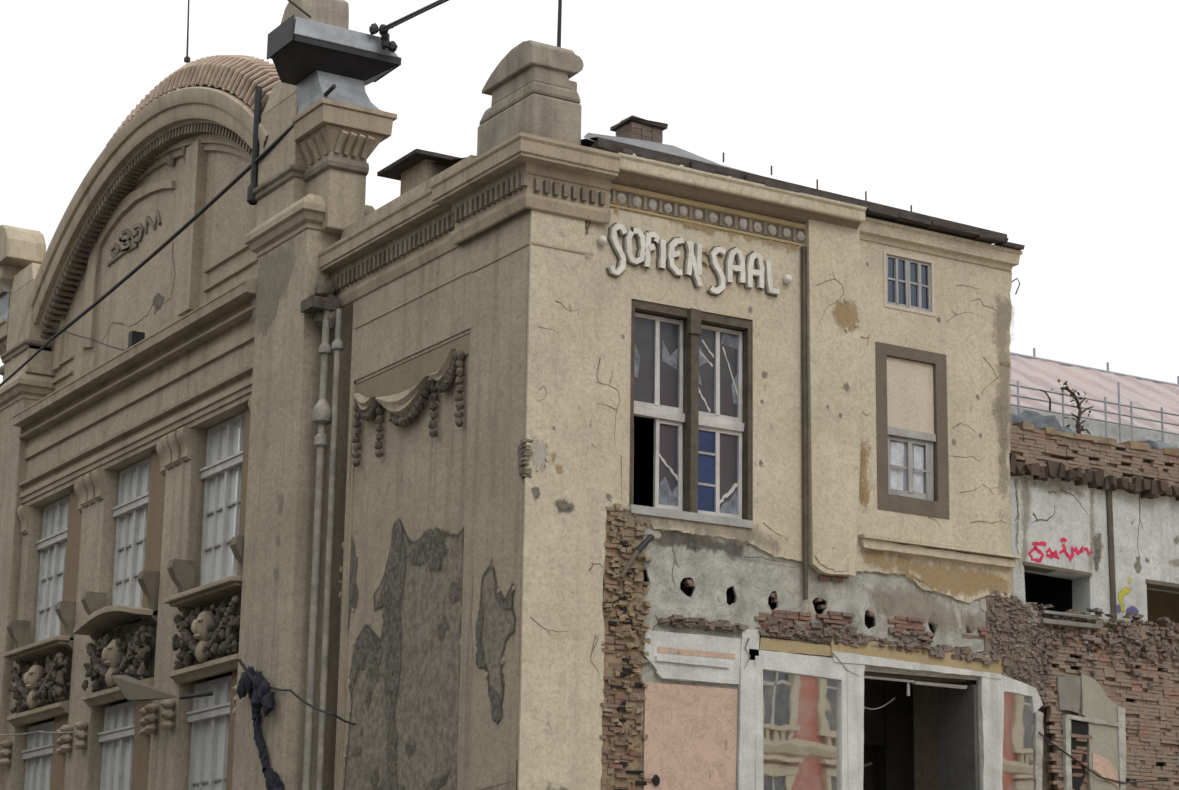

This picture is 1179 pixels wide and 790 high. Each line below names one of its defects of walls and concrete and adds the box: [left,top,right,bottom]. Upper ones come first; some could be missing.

crack [817,271,847,317]
damp [993,299,1102,571]
peeling [339,519,516,790]
flaking render [600,494,1179,790]